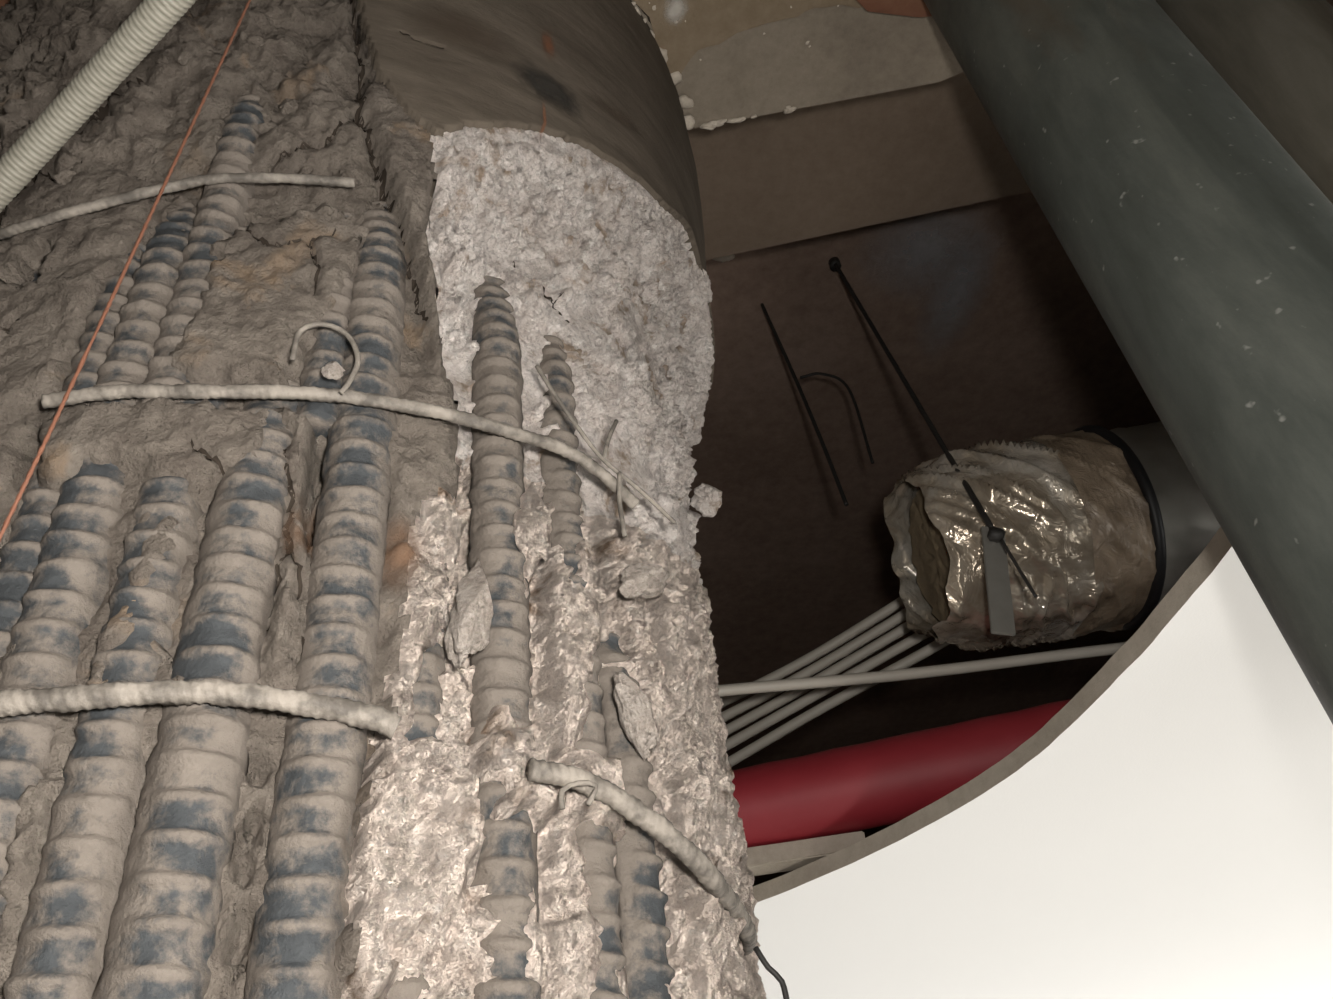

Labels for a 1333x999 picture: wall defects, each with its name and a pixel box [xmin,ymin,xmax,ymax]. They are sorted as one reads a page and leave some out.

flaking render [633,0,863,130]
crack [190,438,225,476]
crack [267,449,312,631]
spalling [0,0,767,999]